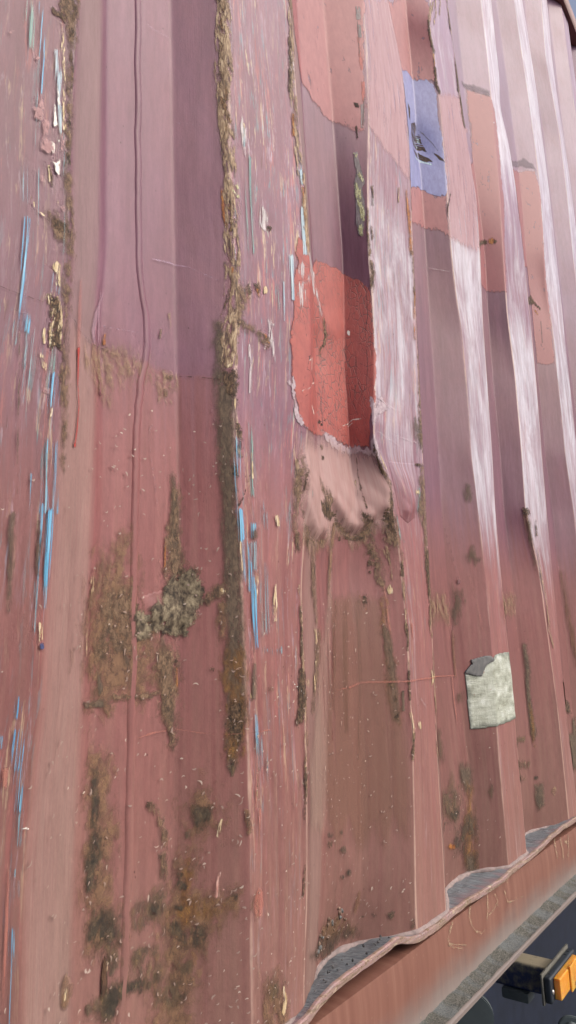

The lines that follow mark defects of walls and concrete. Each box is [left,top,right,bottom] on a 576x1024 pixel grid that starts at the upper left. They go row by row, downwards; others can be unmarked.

peeling [354,6,365,138]
corrosion [52,0,80,470]
corrosion [214,0,270,368]
peeling [288,376,304,426]
crack [301,249,374,426]
peeling [318,396,387,463]
corrosion [84,534,180,749]
corrosion [293,444,421,820]
corrosion [83,752,122,975]
corrosion [133,790,239,1024]